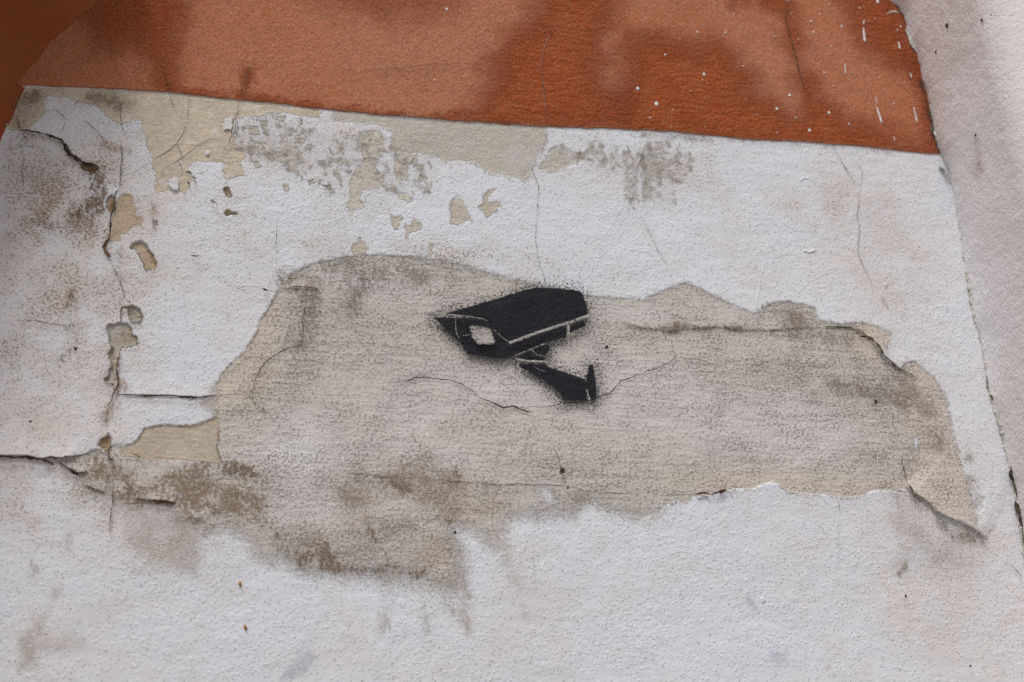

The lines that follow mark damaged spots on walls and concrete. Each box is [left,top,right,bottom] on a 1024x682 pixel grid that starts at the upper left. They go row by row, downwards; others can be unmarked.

peeling [107,193,157,270]
peeling [5,85,694,224]
peeling [380,203,422,239]
crack [0,230,319,527]
peeling [61,236,985,598]
crack [395,339,722,413]